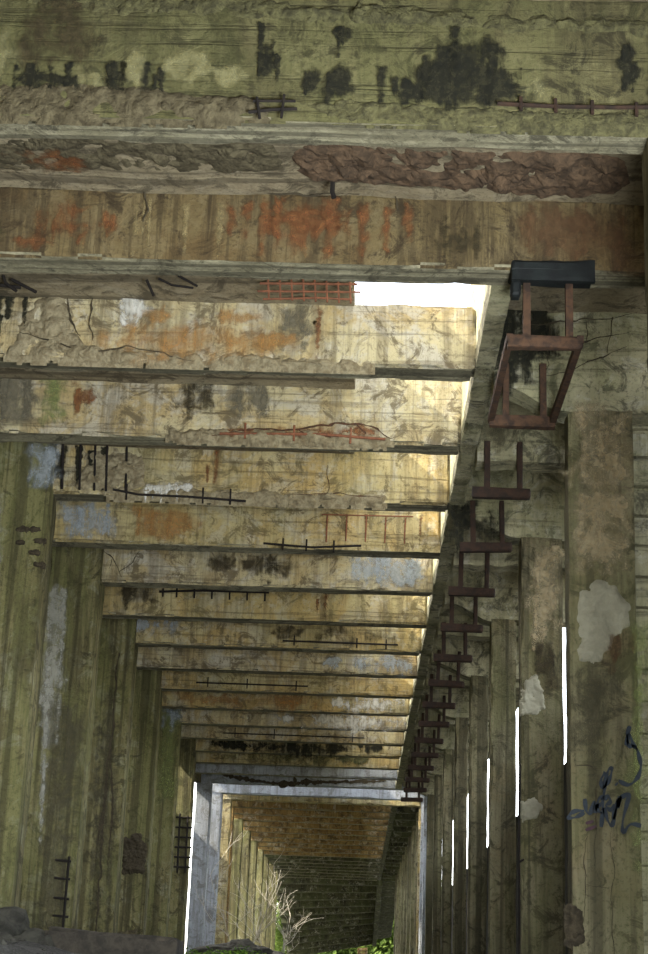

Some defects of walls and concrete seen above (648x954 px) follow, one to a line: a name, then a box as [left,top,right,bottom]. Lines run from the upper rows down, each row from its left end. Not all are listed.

damp [377,26,526,111]
damp [617,45,641,93]
spalling [0,138,630,199]
damp [0,296,36,333]
damp [208,554,290,583]